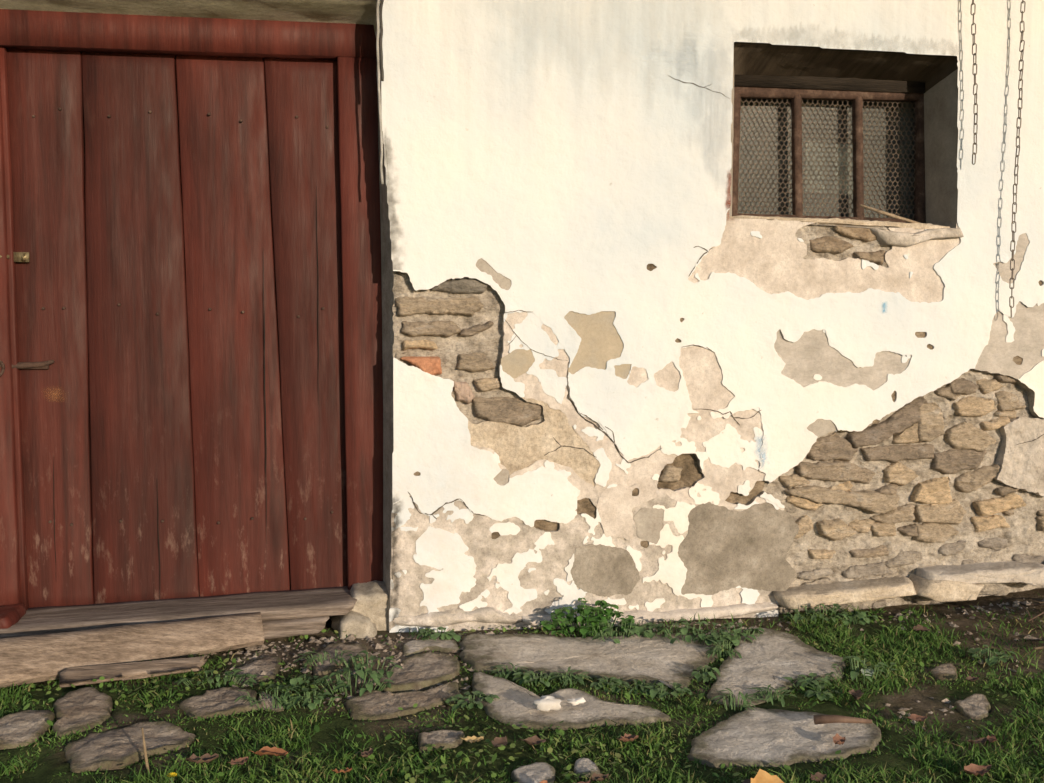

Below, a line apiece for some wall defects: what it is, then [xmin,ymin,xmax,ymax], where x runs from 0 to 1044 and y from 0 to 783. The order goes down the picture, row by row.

crack [670,76,730,99]
peeling [688,210,960,303]
spalling [389,271,1044,633]